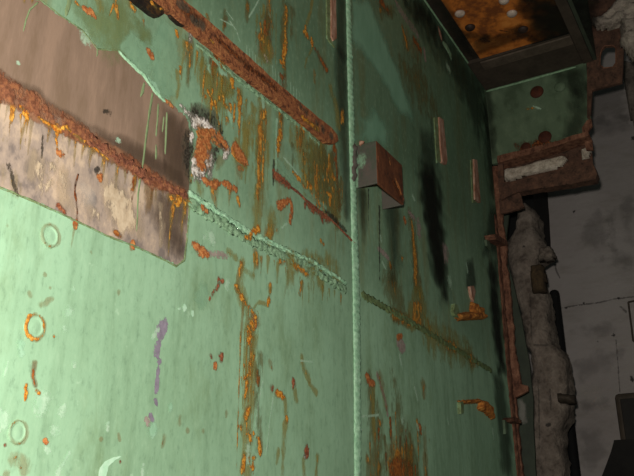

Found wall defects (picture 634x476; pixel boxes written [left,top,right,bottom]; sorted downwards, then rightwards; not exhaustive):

corrosion [0,72,208,240]
peeling [0,0,231,267]
water stain [104,181,136,234]
corrosion [153,0,343,215]
corrosion [274,258,310,296]
corrosion [209,277,262,475]
corrosion [367,412,426,476]